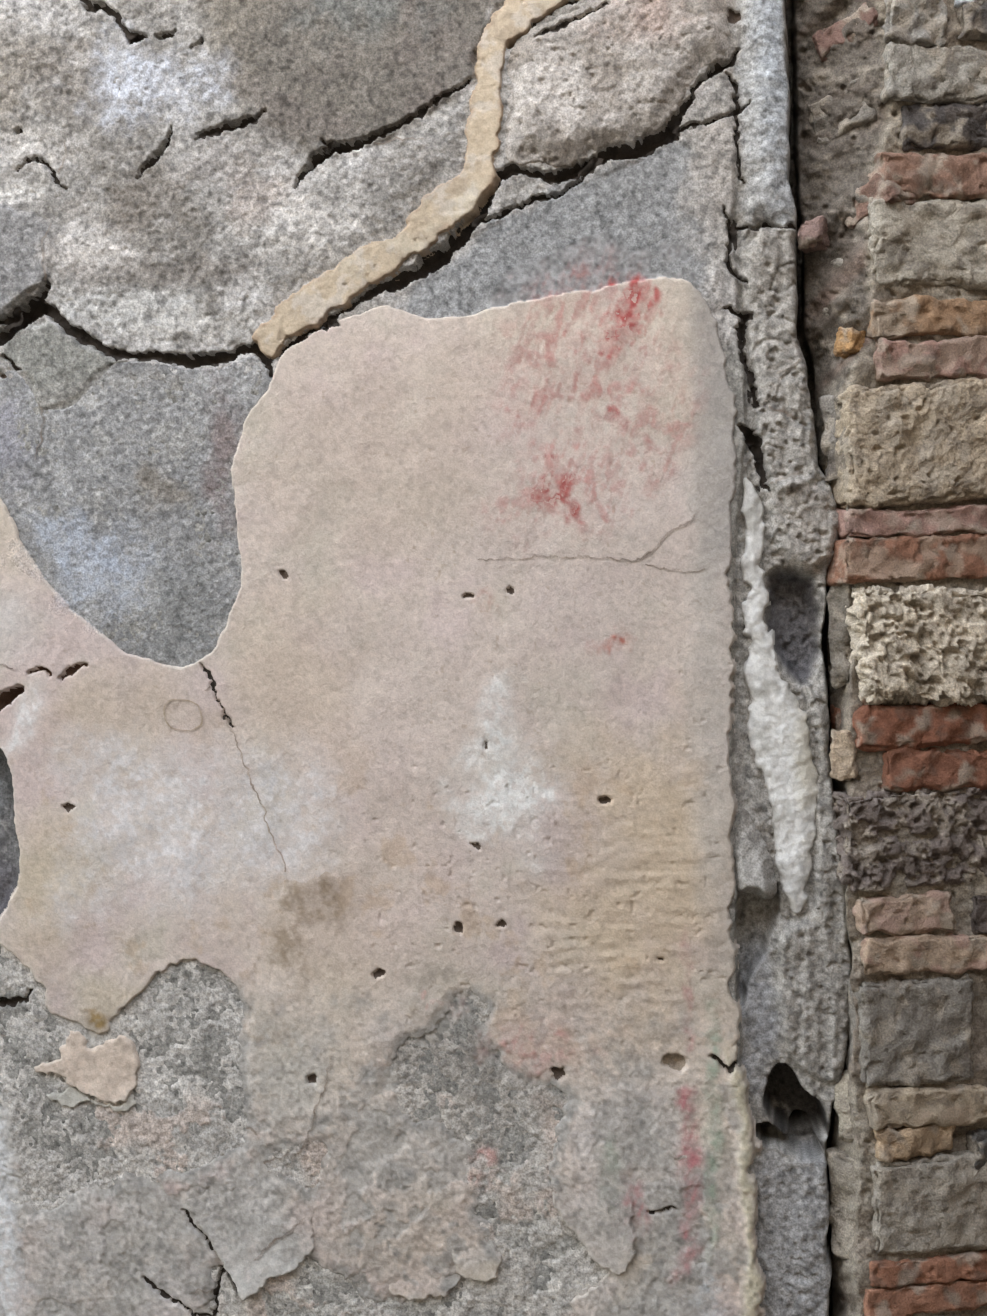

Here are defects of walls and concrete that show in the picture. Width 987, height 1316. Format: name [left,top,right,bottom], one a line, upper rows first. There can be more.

crack [80,0,203,48]
crack [523,0,609,37]
crack [0,51,750,377]
crack [34,402,46,461]
spalling [0,356,274,667]
crack [478,514,705,574]
crack [723,209,805,492]
spalling [0,748,20,914]
crack [202,664,286,872]
spalling [0,944,248,1211]
spalling [187,1022,635,1316]